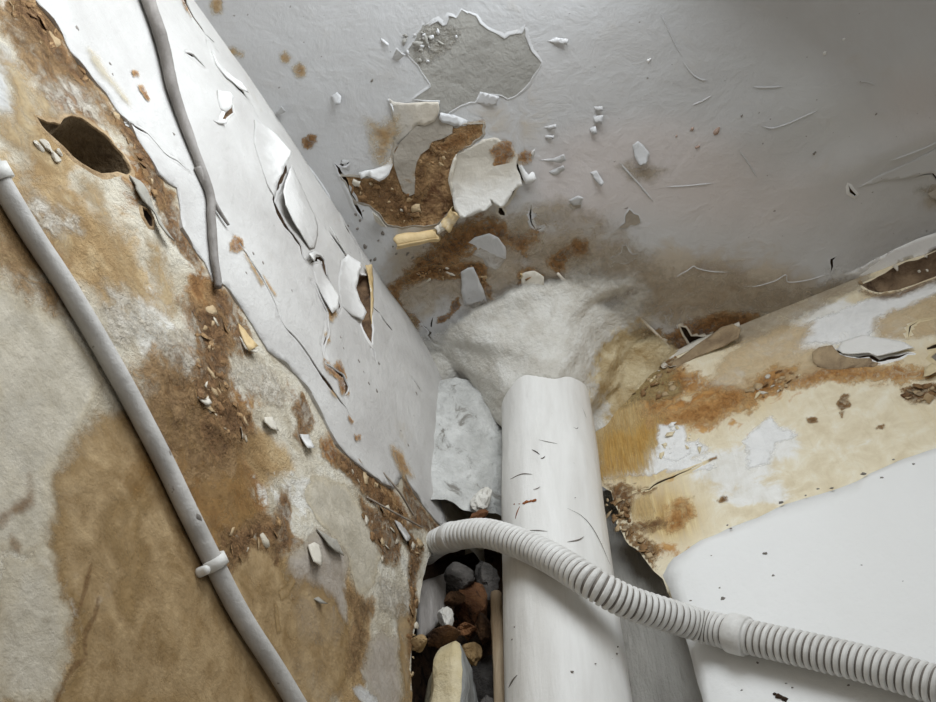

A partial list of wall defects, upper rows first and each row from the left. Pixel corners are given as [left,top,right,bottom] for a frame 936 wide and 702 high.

damp [0,0,123,171]
peeling [253,120,374,324]
peeling [340,8,543,230]
spalling [407,233,506,308]
peeling [843,233,936,277]
crack [916,174,936,184]
peeling [812,335,914,370]
damp [101,237,351,702]
damp [595,395,660,480]
spalling [657,422,703,461]
damp [51,415,283,702]
damp [379,577,416,702]